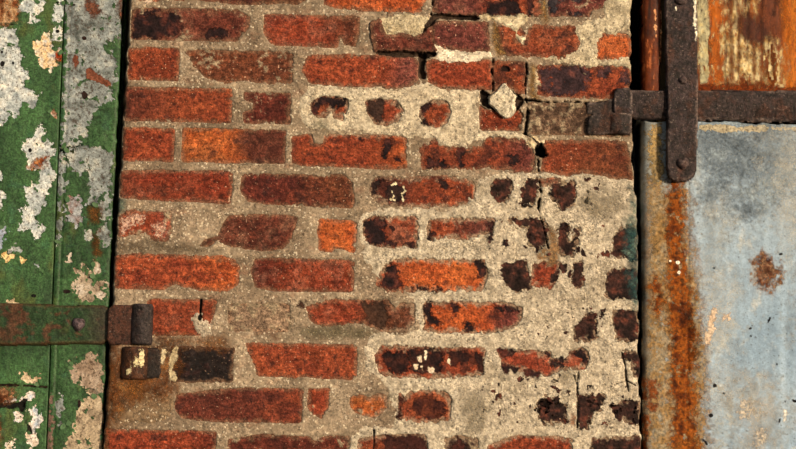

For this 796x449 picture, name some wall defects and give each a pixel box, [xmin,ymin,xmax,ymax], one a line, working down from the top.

spalling [132,7,184,40]
spalling [203,27,231,40]
peeling [697,0,710,84]
rust [698,0,796,91]
peeling [720,0,786,89]
peeling [0,0,124,273]
peeling [63,252,111,303]
rust [638,177,712,449]
rust [749,250,785,294]
peeling [4,351,106,449]